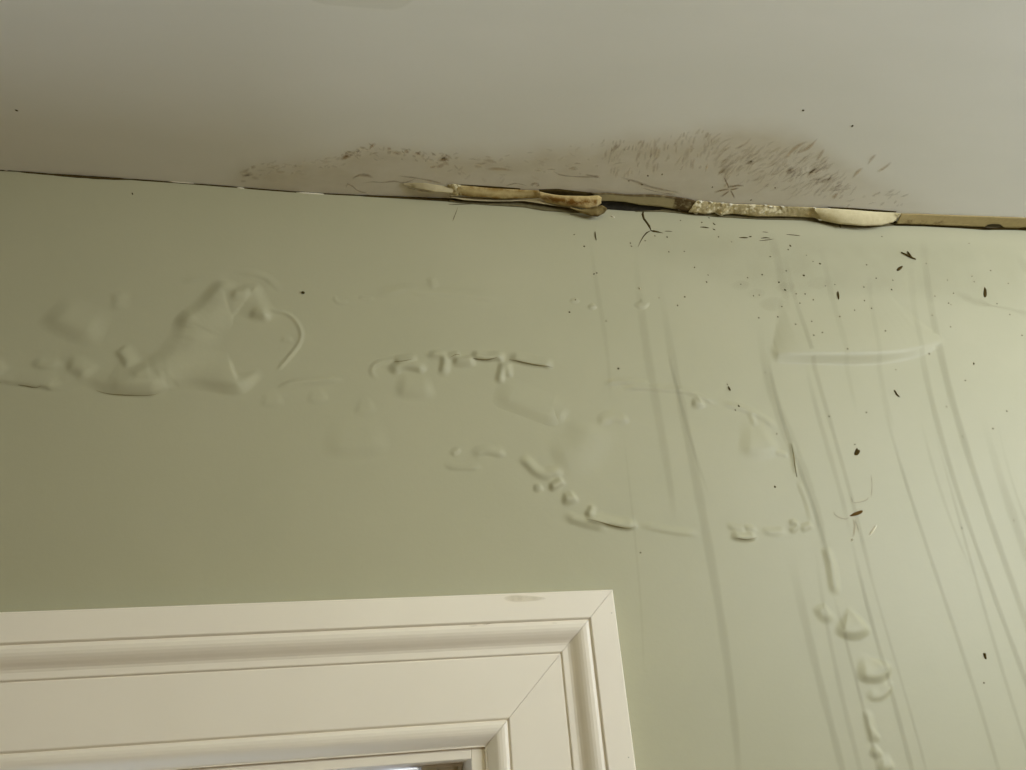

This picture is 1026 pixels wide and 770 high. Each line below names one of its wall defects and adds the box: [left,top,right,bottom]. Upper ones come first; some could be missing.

peeling [813,208,901,226]